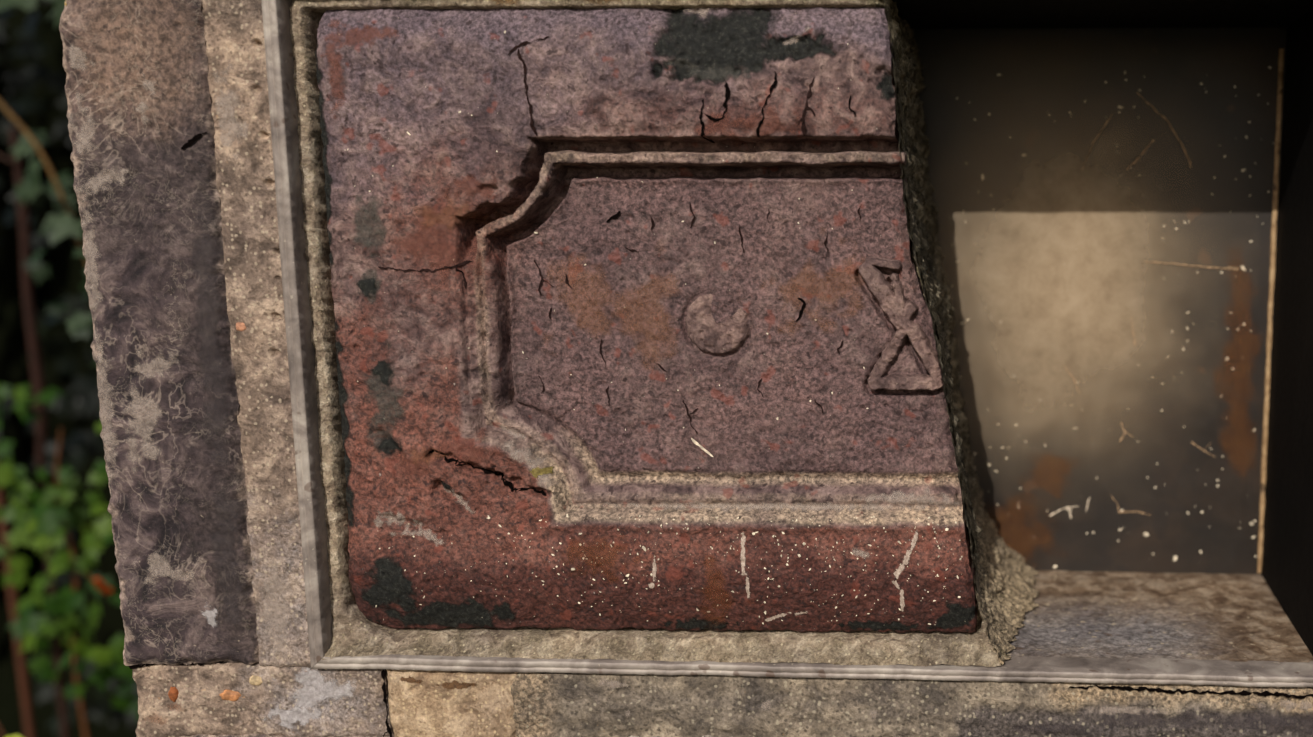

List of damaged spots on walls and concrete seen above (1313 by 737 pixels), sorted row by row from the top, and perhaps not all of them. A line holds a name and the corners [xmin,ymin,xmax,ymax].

crack [508,36,554,145]
crack [699,77,730,143]
crack [756,71,777,137]
crack [796,76,815,136]
crack [423,449,546,496]
water stain [361,556,515,628]